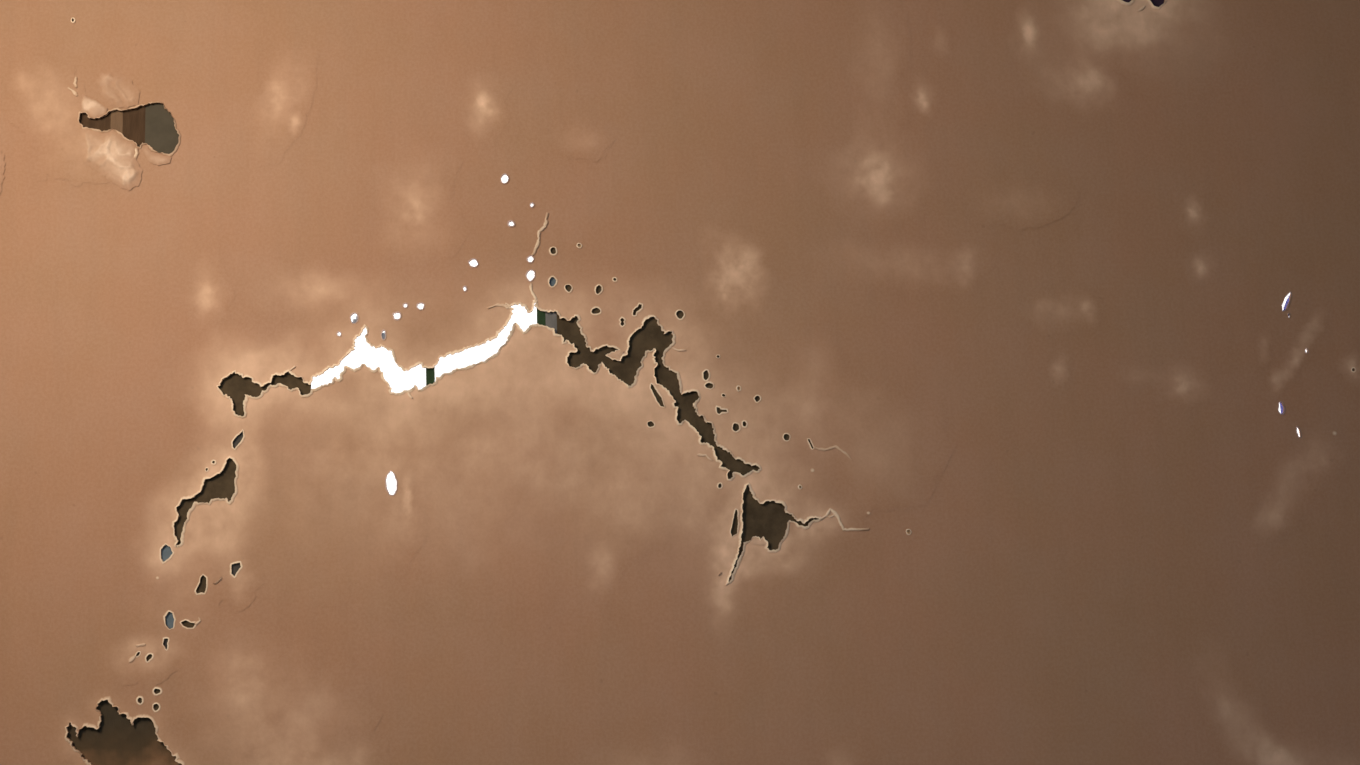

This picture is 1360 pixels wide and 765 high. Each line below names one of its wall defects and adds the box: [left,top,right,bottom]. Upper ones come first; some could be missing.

peeling [77,71,171,191]
water stain [41,0,1081,765]
spalling [703,371,746,431]
spalling [156,432,243,580]
spalling [137,612,195,661]
spalling [197,575,206,593]